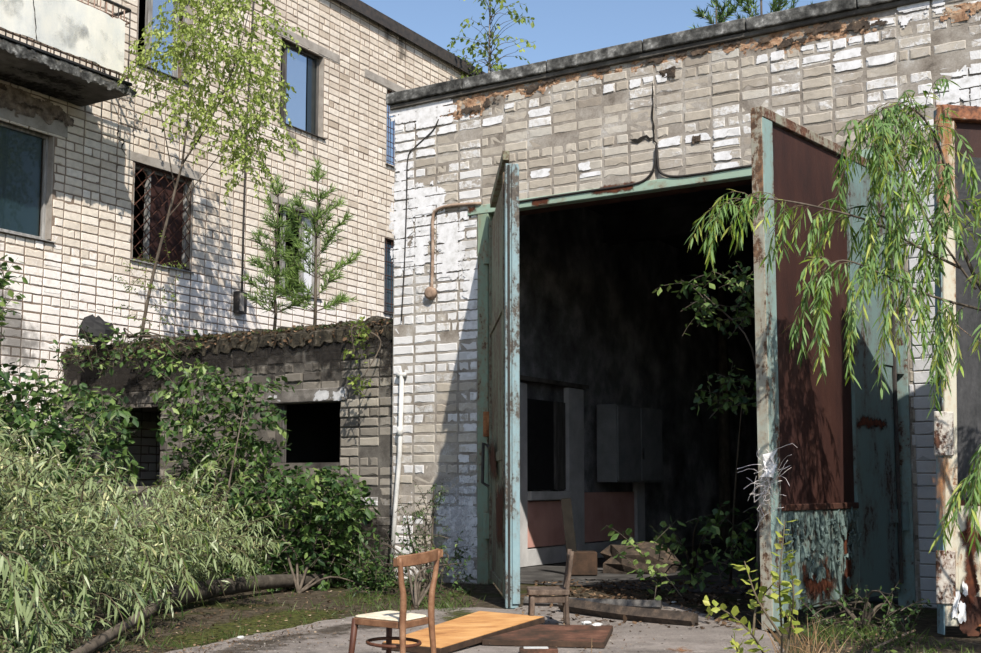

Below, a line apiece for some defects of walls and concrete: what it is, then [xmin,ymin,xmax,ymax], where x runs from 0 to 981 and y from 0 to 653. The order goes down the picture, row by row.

spalling [0,83,74,128]
peeling [389,0,981,340]
peeling [459,352,477,377]
peeling [463,413,477,431]
rust [856,415,887,430]
rust [488,435,504,553]
rust [801,525,854,604]
rust [958,499,981,606]